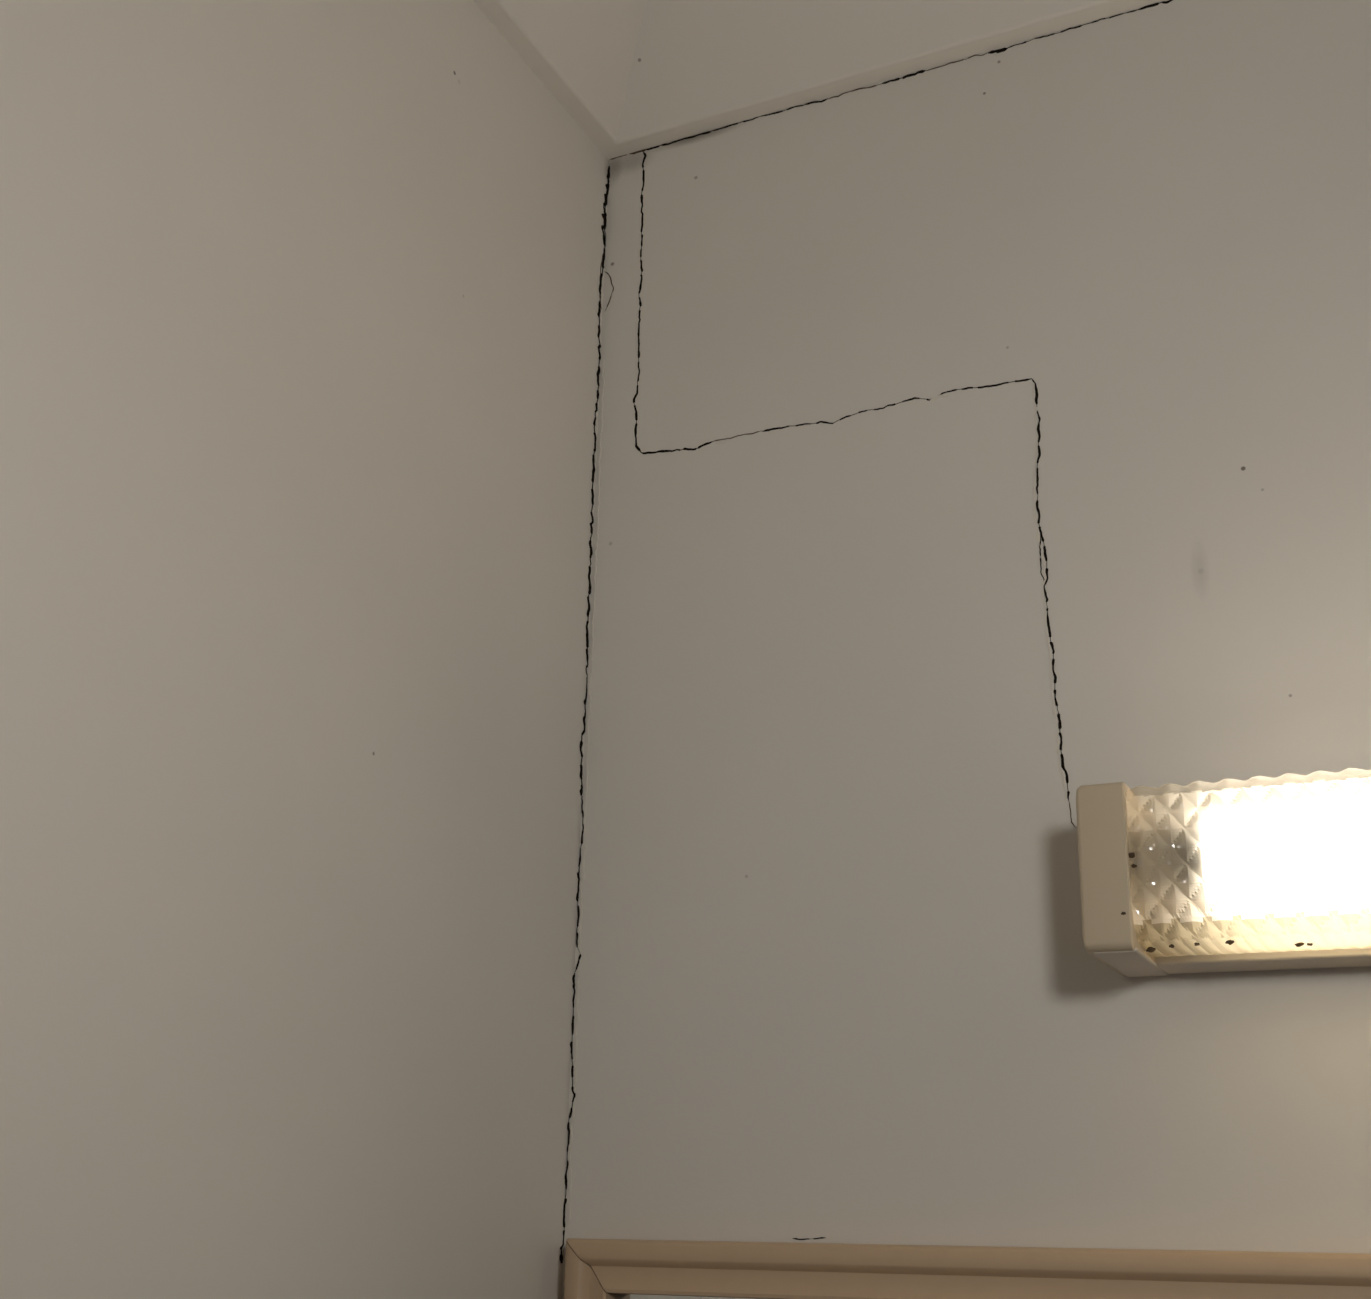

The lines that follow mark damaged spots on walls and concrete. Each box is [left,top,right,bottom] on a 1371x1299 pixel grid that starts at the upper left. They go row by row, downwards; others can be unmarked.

crack [560,0,1172,1263]